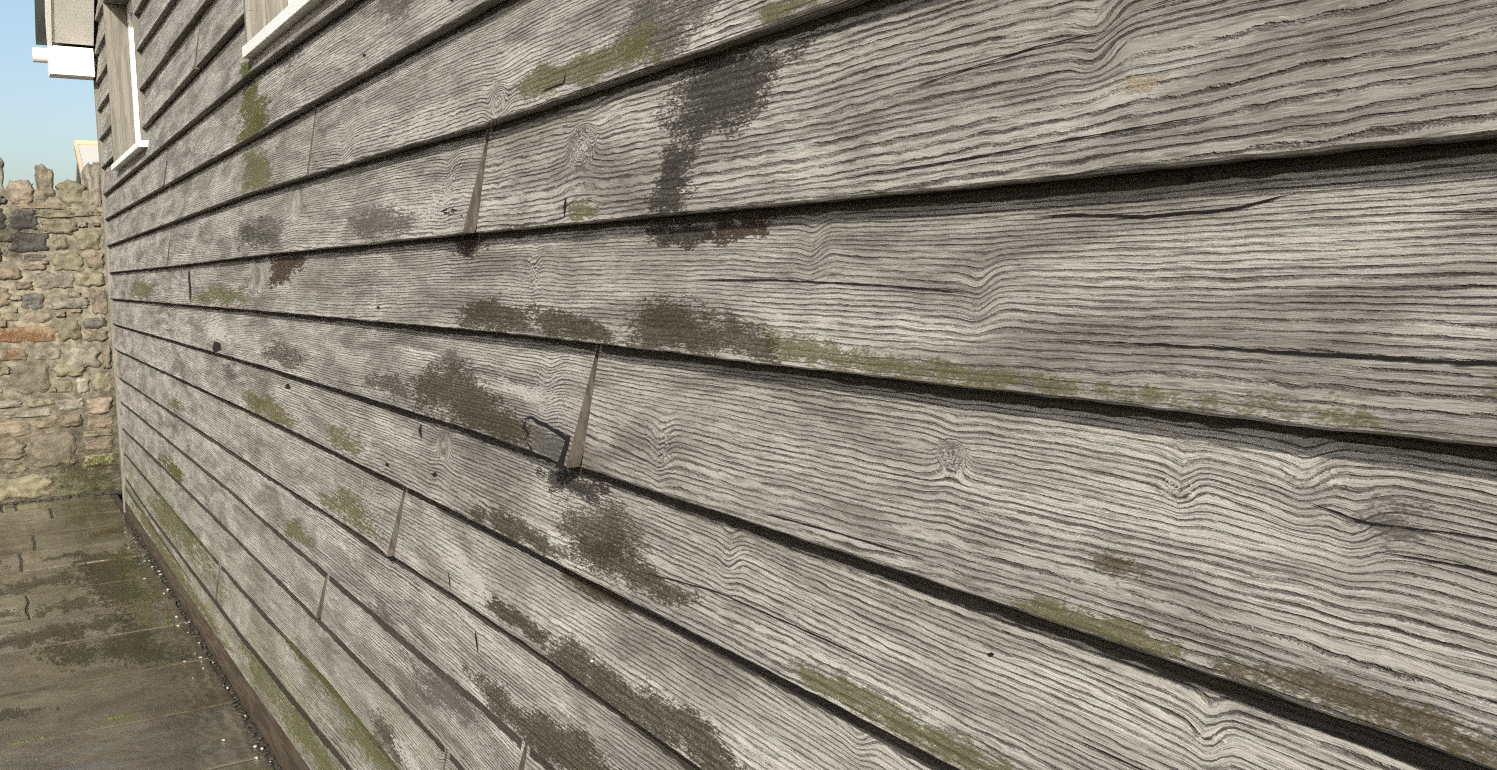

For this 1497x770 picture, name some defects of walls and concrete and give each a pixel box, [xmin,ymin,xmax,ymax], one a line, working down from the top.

damp [640,21,841,252]
damp [535,465,614,505]